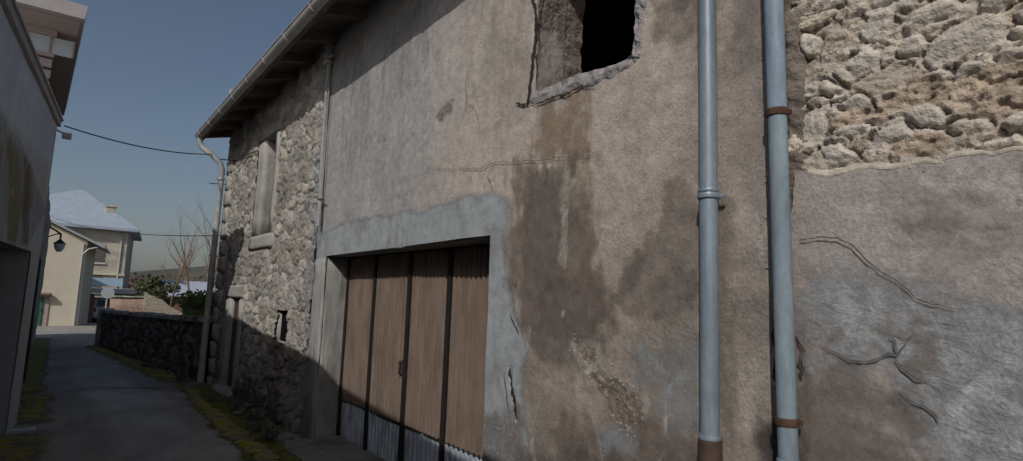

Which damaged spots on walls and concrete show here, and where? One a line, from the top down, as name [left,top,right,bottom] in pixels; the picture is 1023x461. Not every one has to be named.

crack [516,0,596,106]
damp [509,164,614,362]
crack [799,236,956,310]
crack [503,368,517,420]
spalling [795,336,806,381]
crack [820,335,939,423]